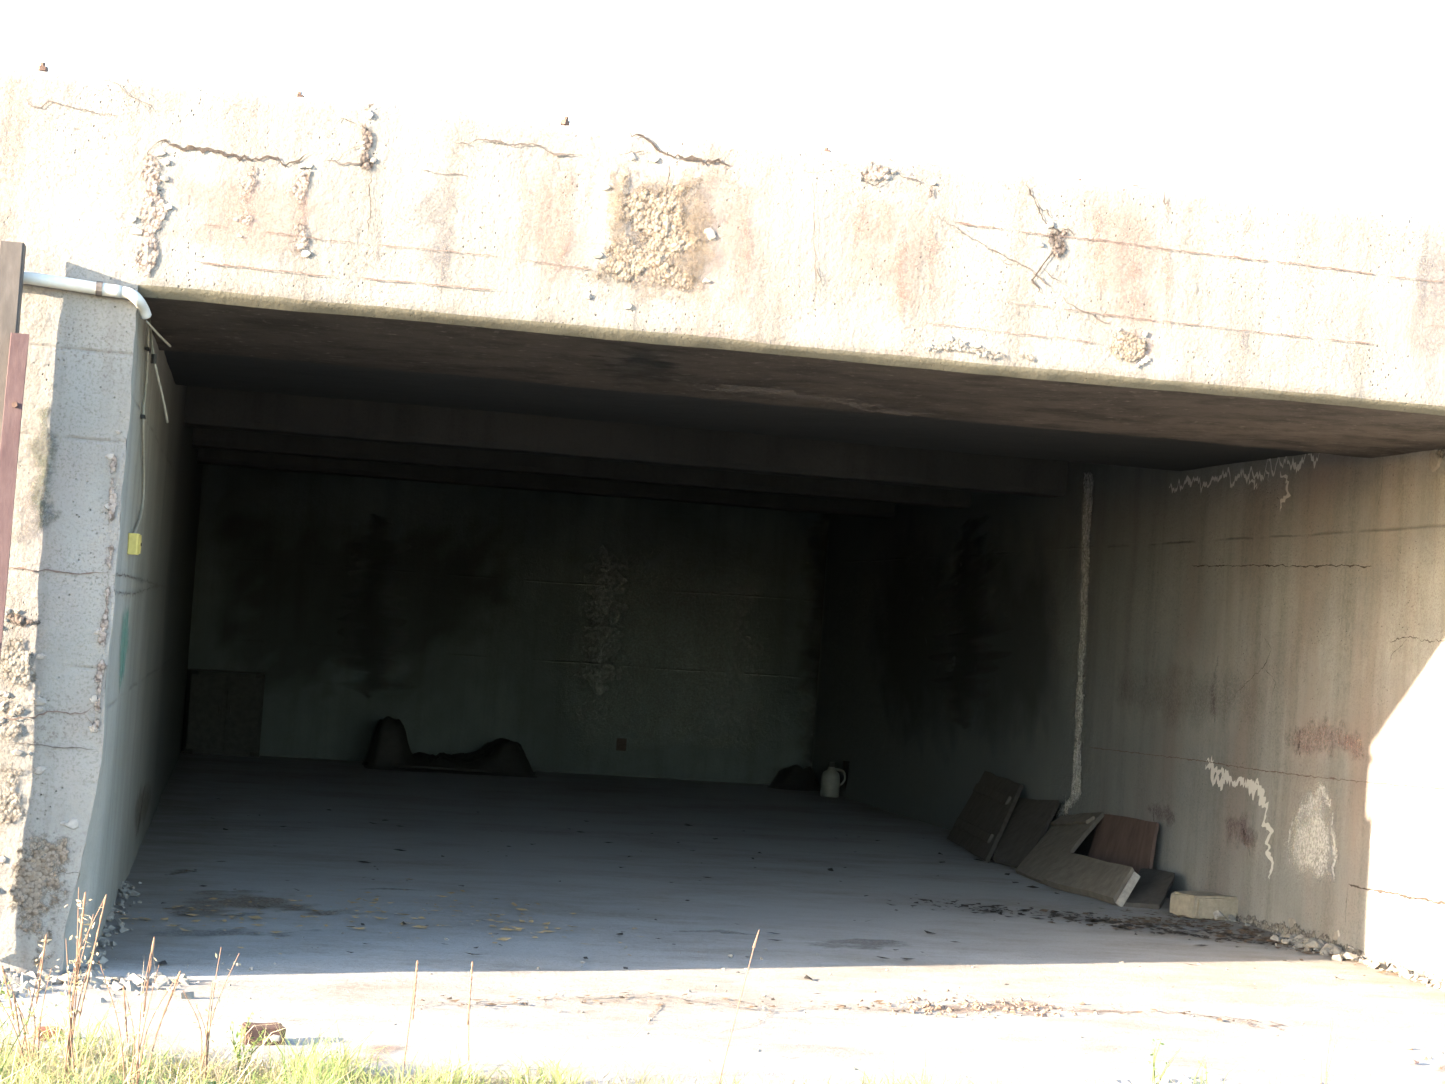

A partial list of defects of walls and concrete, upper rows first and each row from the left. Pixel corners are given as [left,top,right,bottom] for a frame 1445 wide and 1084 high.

spalling [128,150,173,276]
crack [25,79,360,177]
spalling [338,104,377,230]
crack [422,139,584,177]
spalling [584,152,716,309]
crack [619,130,728,203]
spalling [1111,327,1151,368]
crack [922,182,1445,388]
spalling [0,608,47,826]
spalling [0,818,81,965]
crack [1345,884,1445,921]